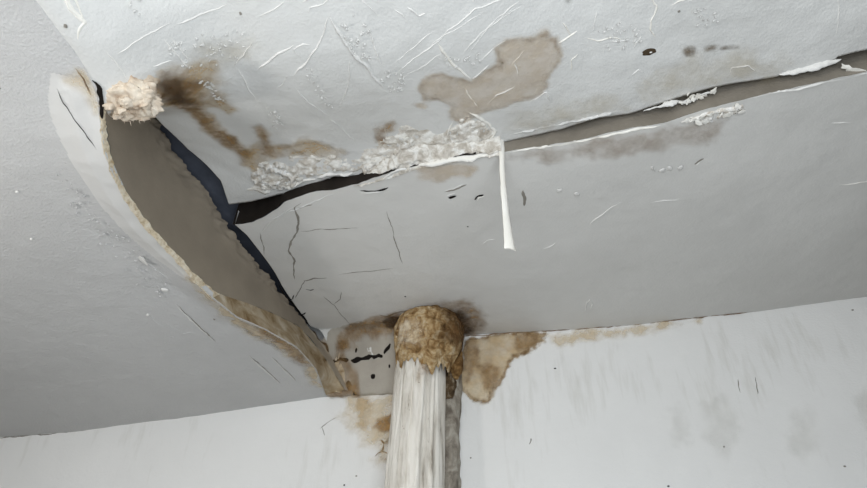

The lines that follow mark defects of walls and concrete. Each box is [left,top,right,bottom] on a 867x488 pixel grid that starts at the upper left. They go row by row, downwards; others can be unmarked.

damp [161,67,281,169]
crack [454,50,867,157]
crack [232,164,419,363]
damp [334,314,399,443]
damp [449,303,545,402]